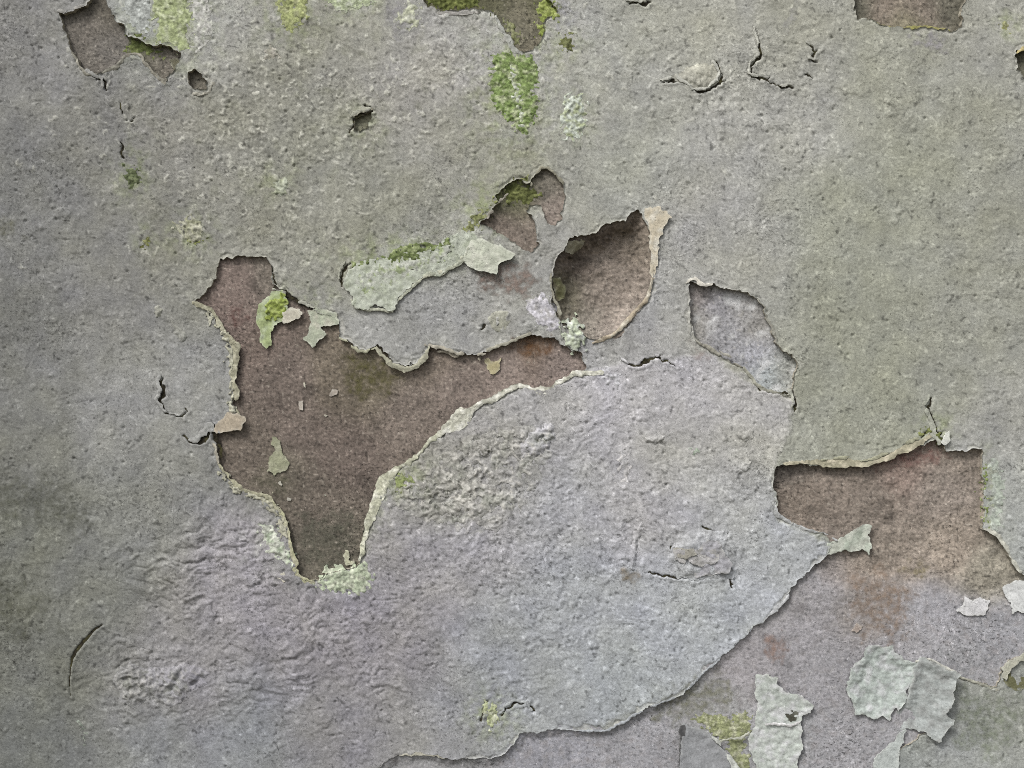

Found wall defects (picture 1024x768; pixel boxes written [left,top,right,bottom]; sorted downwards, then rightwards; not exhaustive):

peeling [54,0,181,84]
peeling [423,0,554,55]
crack [660,26,818,94]
spalling [854,0,964,32]
peeling [343,166,565,313]
spalling [549,206,672,344]
peeling [685,277,796,397]
crack [154,374,223,460]
peeling [192,256,626,584]
peeling [380,431,1024,768]
crack [69,624,103,696]